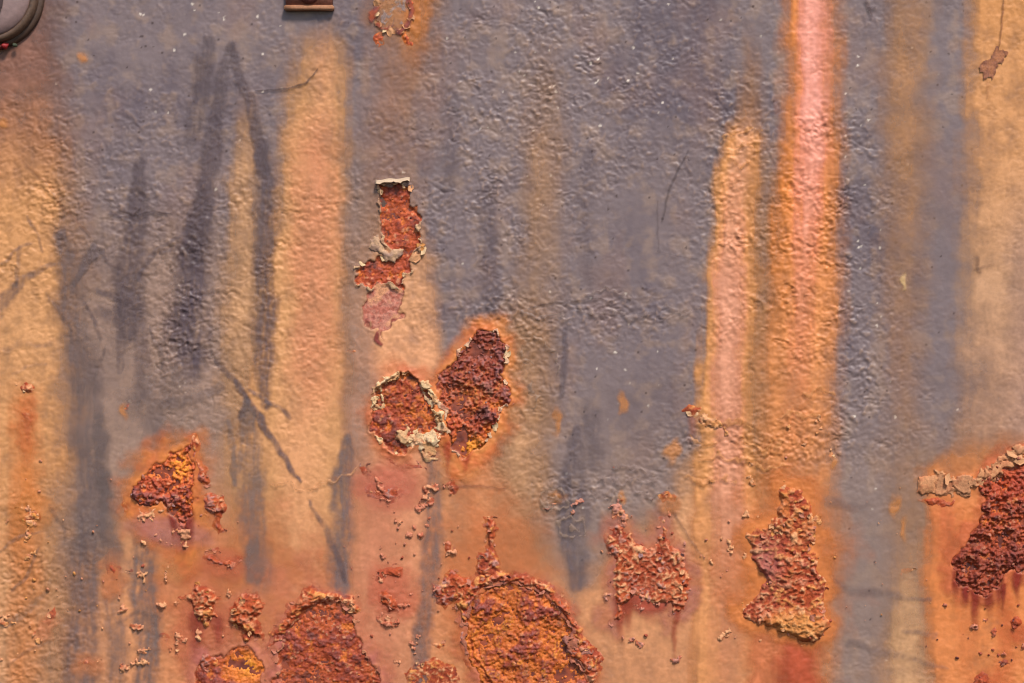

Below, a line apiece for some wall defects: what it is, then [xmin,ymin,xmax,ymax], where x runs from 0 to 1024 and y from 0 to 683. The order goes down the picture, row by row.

damp [104,158,145,340]
damp [172,60,223,368]
corrosion [0,0,442,683]
damp [232,50,271,210]
damp [232,249,301,571]
peeling [354,177,426,346]
peeling [366,316,521,479]
corrosion [404,0,841,683]
corrosion [892,0,1024,683]